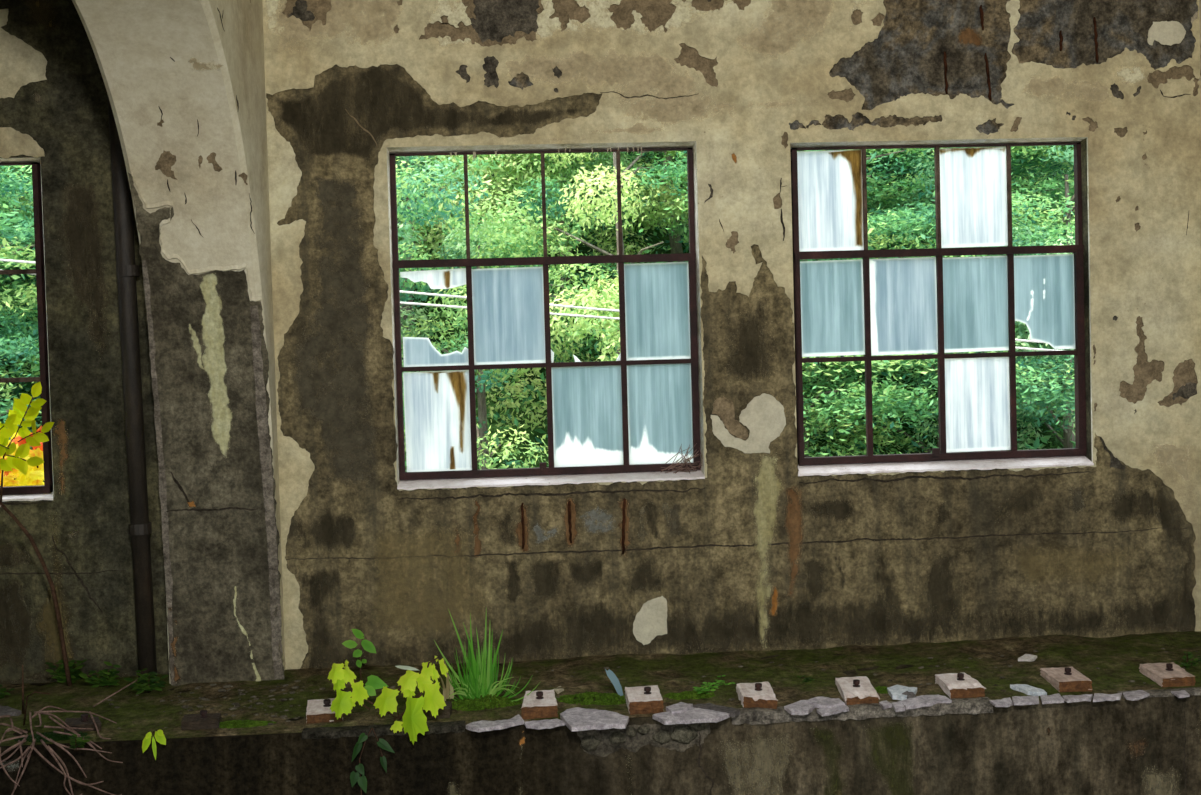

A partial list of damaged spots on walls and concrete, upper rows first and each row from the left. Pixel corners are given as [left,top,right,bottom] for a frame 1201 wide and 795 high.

spalling [128,0,1200,686]
leakage [299,512,356,551]
leakage [296,571,364,669]
leakage [377,456,1196,665]